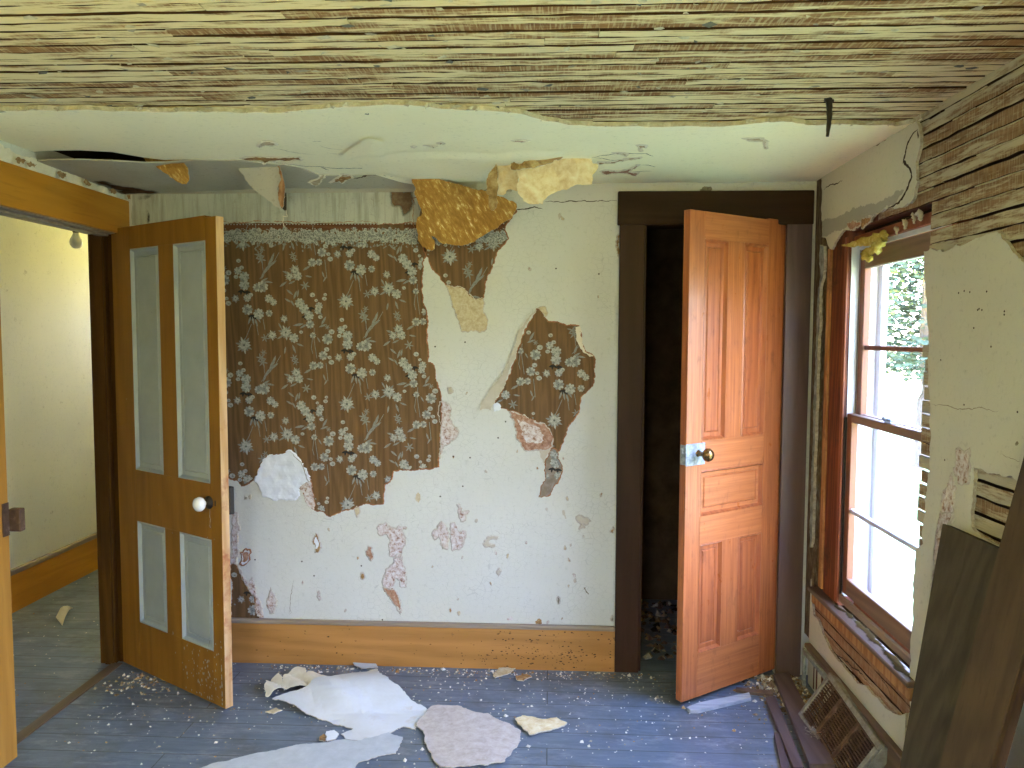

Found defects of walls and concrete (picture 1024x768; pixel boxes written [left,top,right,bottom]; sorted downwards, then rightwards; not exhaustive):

crack [888,129,919,208]
peeling [446,284,488,333]
spalling [437,400,459,459]
spalling [509,411,554,463]
peeling [254,450,311,501]
spalling [431,503,470,552]
peeling [930,446,972,593]
spalling [376,522,408,615]